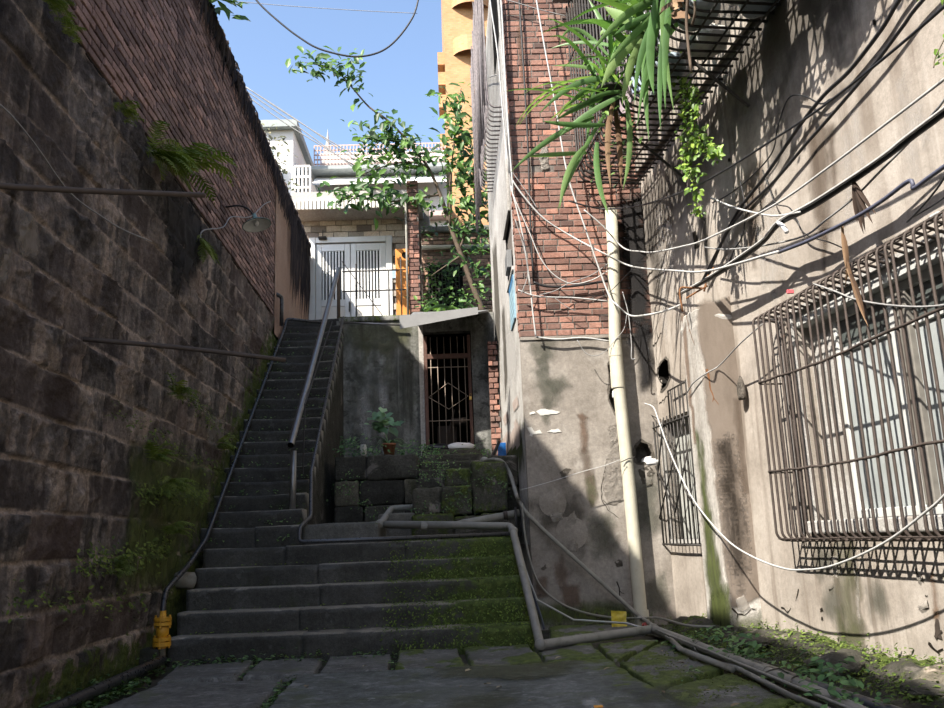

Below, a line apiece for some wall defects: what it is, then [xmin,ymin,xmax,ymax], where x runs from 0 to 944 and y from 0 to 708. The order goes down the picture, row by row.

water stain [645,143,707,329]
water stain [701,217,710,265]
water stain [534,345,566,420]
water stain [633,319,654,389]
spalling [657,357,671,393]
water stain [583,450,595,503]
water stain [697,296,760,630]
water stain [538,502,582,529]